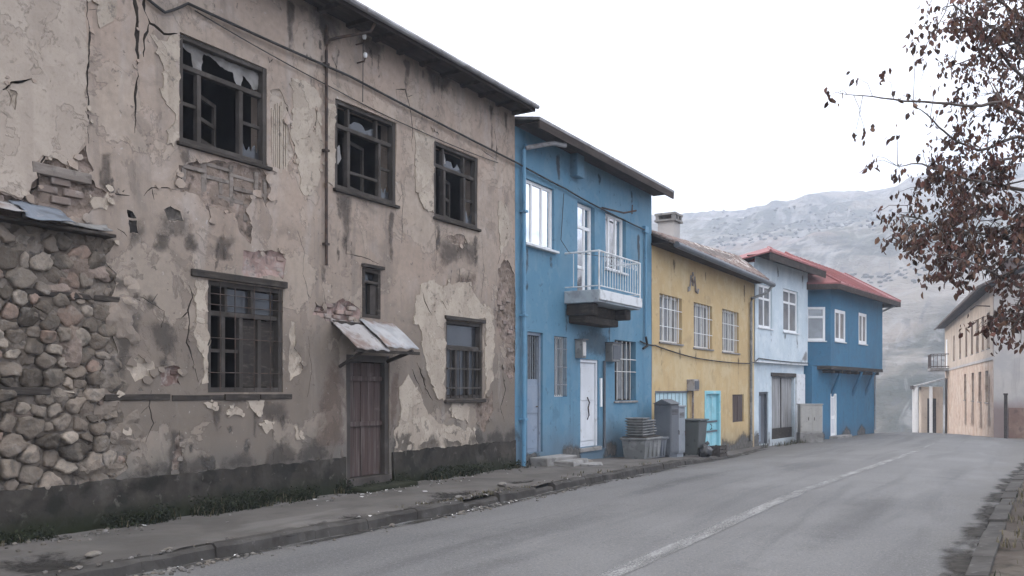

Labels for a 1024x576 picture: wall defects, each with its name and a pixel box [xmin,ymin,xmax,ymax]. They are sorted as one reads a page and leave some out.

crack [3,76,37,90]
flaking render [0,0,118,204]
crack [84,2,95,143]
crack [132,0,177,126]
flaking render [82,184,115,223]
hole [164,206,183,221]
peeling [249,167,278,201]
leakage [436,229,477,280]
crack [139,286,198,379]
crack [412,366,432,399]
flaking render [393,279,495,452]
flaking render [203,399,275,434]